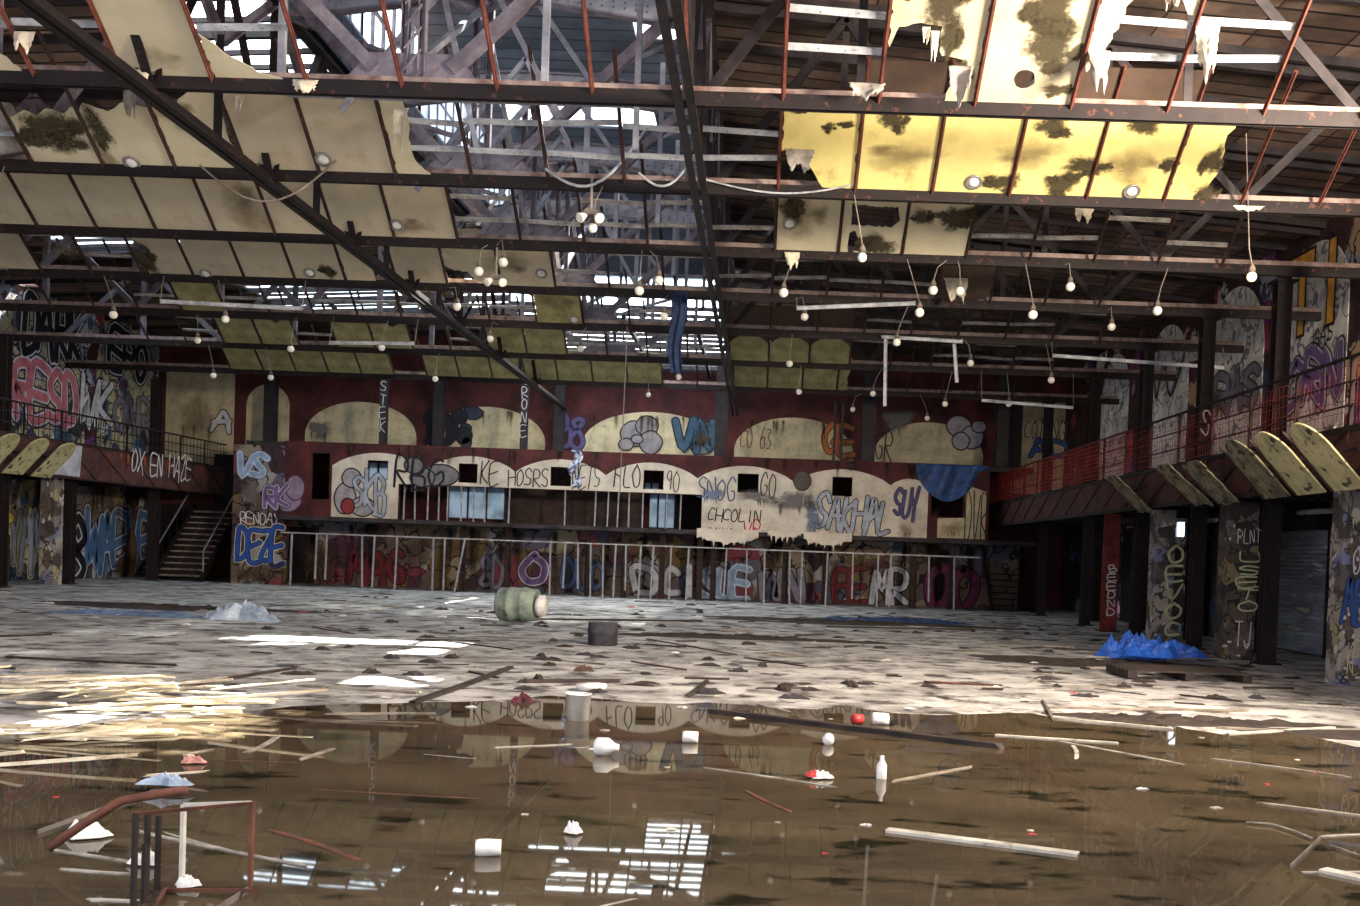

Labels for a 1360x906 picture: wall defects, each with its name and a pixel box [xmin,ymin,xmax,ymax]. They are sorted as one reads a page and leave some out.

water stain [925,0,973,79]
water stain [1018,0,1085,98]
water stain [18,103,116,153]
water stain [1035,120,1073,139]
water stain [1127,123,1158,135]
water stain [982,173,1020,194]
water stain [1044,158,1114,196]
water stain [1158,157,1180,173]
water stain [1193,146,1225,201]